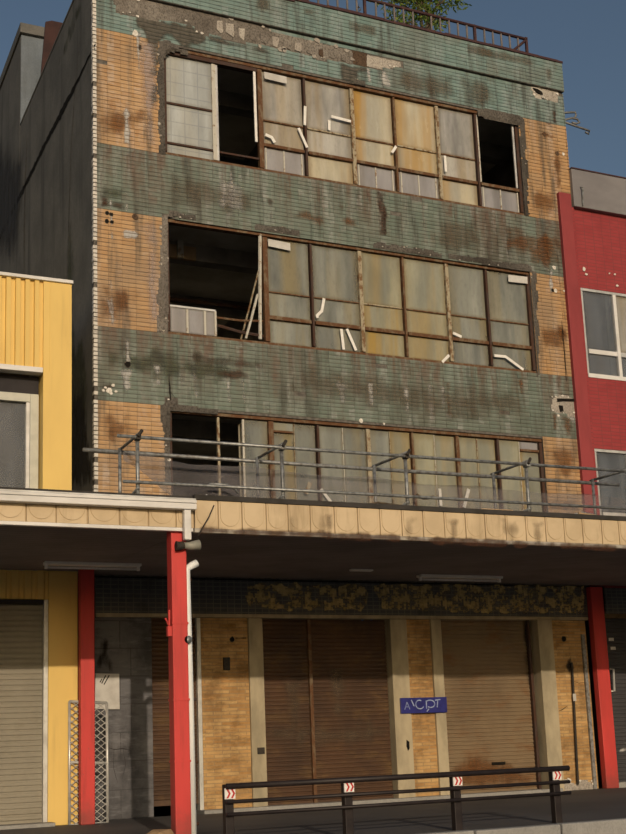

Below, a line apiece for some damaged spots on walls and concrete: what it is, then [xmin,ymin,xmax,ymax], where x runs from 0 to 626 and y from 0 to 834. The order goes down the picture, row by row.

spalling [113,0,401,69]
spalling [530,86,559,103]
spalling [551,395,575,417]
water stain [72,396,91,484]
corrosion [458,760,520,784]